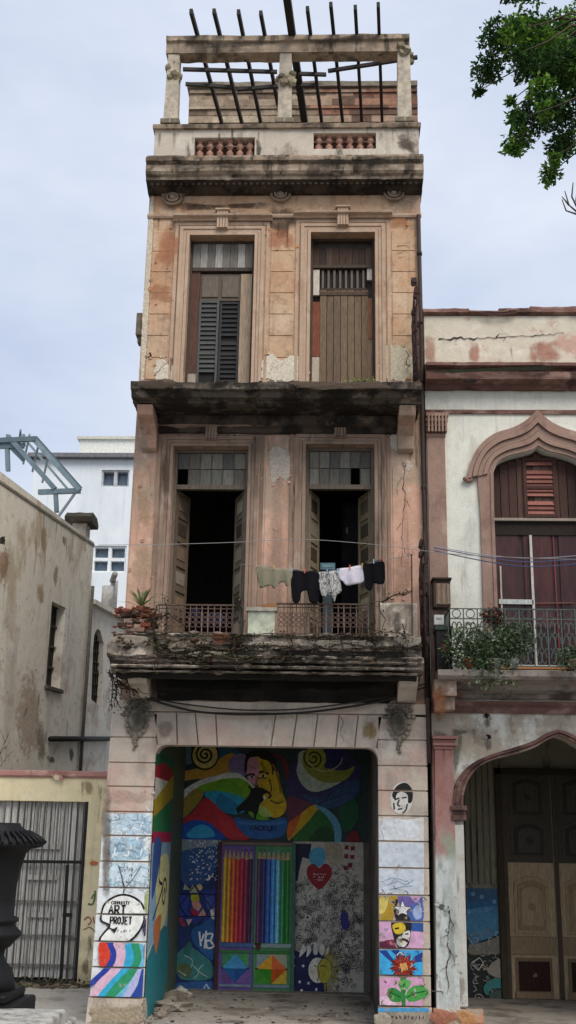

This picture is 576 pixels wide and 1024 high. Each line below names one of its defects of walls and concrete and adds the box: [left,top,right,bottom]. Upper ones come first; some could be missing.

peeling [139,196,184,389]
crack [439,332,562,341]
peeling [261,343,413,390]
peeling [269,445,292,486]
crack [395,465,409,562]
spalling [110,635,153,647]
spalling [168,641,227,657]
spalling [264,640,290,649]
crack [431,906,455,994]